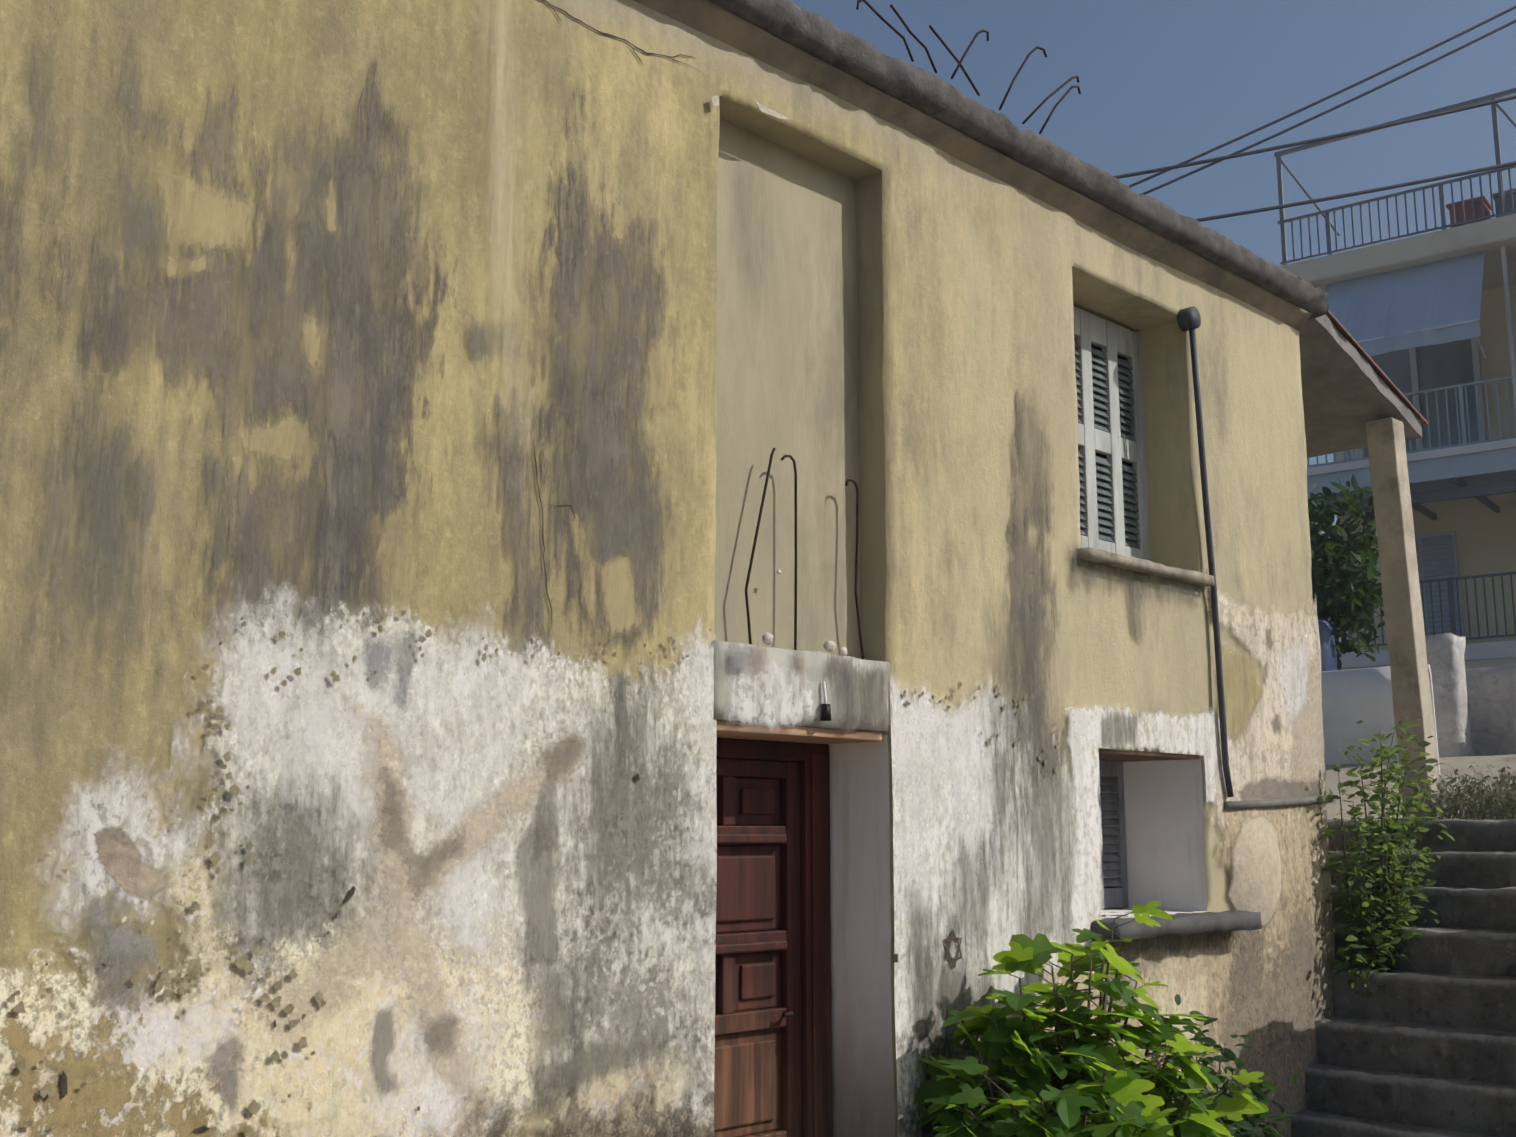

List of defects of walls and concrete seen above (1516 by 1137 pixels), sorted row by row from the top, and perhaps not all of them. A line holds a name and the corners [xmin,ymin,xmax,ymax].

crack [541,0,706,76]
water stain [42,64,445,704]
water stain [486,163,672,659]
peeling [0,596,813,1137]
water stain [518,665,716,1108]
water stain [911,910,991,1042]
water stain [950,847,1003,940]
water stain [995,393,1070,941]
peeling [890,586,1335,1137]